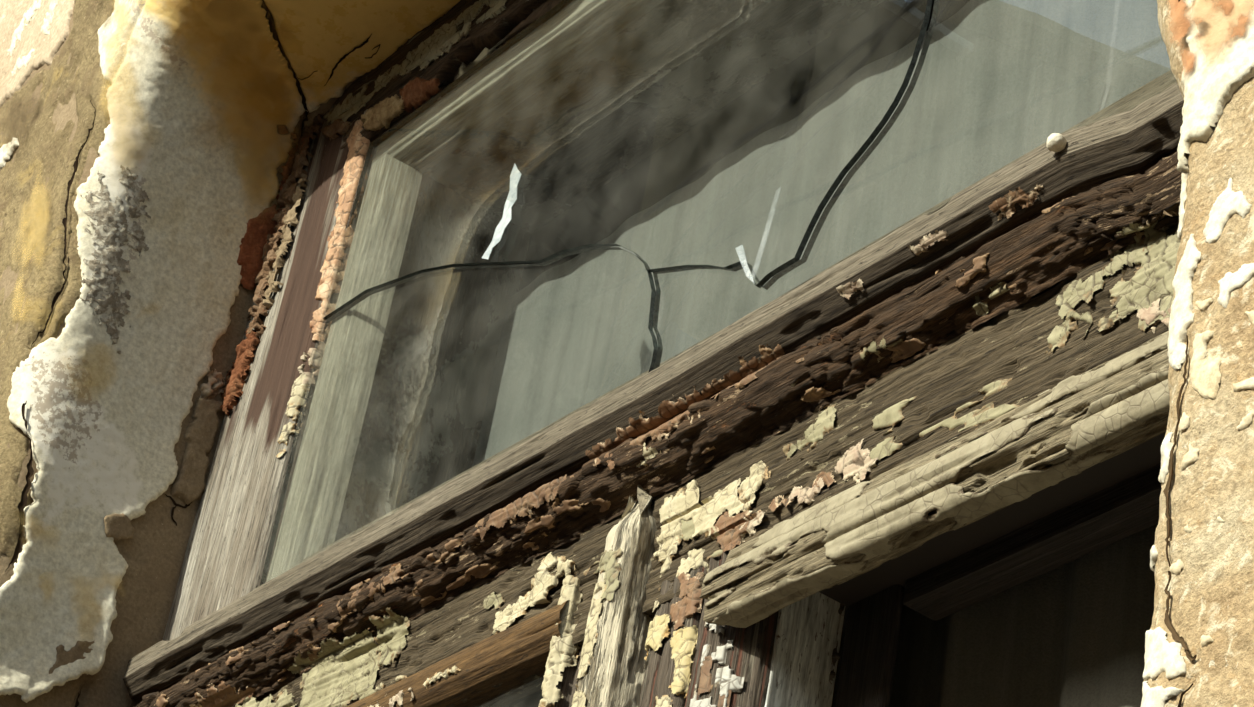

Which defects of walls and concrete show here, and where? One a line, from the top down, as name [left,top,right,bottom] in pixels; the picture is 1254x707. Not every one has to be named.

crack [261,0,380,153]
crack [31,100,96,347]
spalling [0,0,151,563]
peeling [170,0,507,505]
peeling [1045,164,1254,430]
peeling [189,564,460,707]
peeling [475,474,574,540]
peeling [483,548,622,707]
peeling [644,438,879,707]
peeling [783,405,836,460]
peeling [1158,412,1199,483]
crack [1163,335,1197,707]